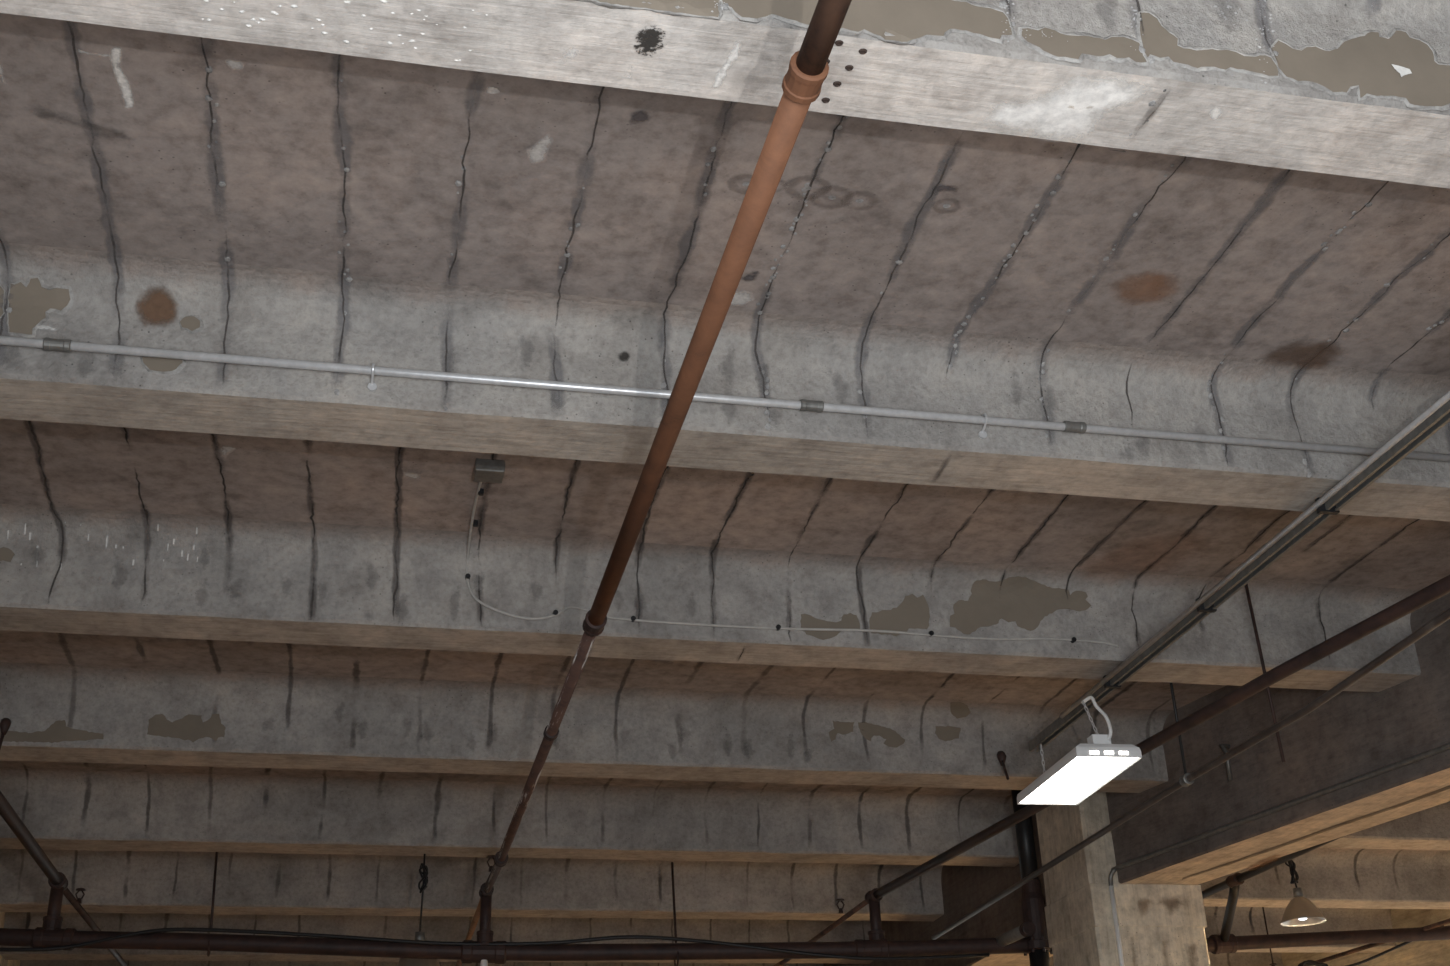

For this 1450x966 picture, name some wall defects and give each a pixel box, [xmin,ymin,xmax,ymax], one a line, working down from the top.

crack [65,20,91,111]
peeling [579,0,818,28]
peeling [838,0,1450,111]
crack [1129,0,1166,136]
peeling [7,275,74,338]
crack [92,149,121,360]
crack [754,115,850,435]
crack [947,144,1080,370]
crack [710,472,754,592]
peeling [800,594,930,640]
peeling [950,576,1091,635]
peeling [829,721,905,748]